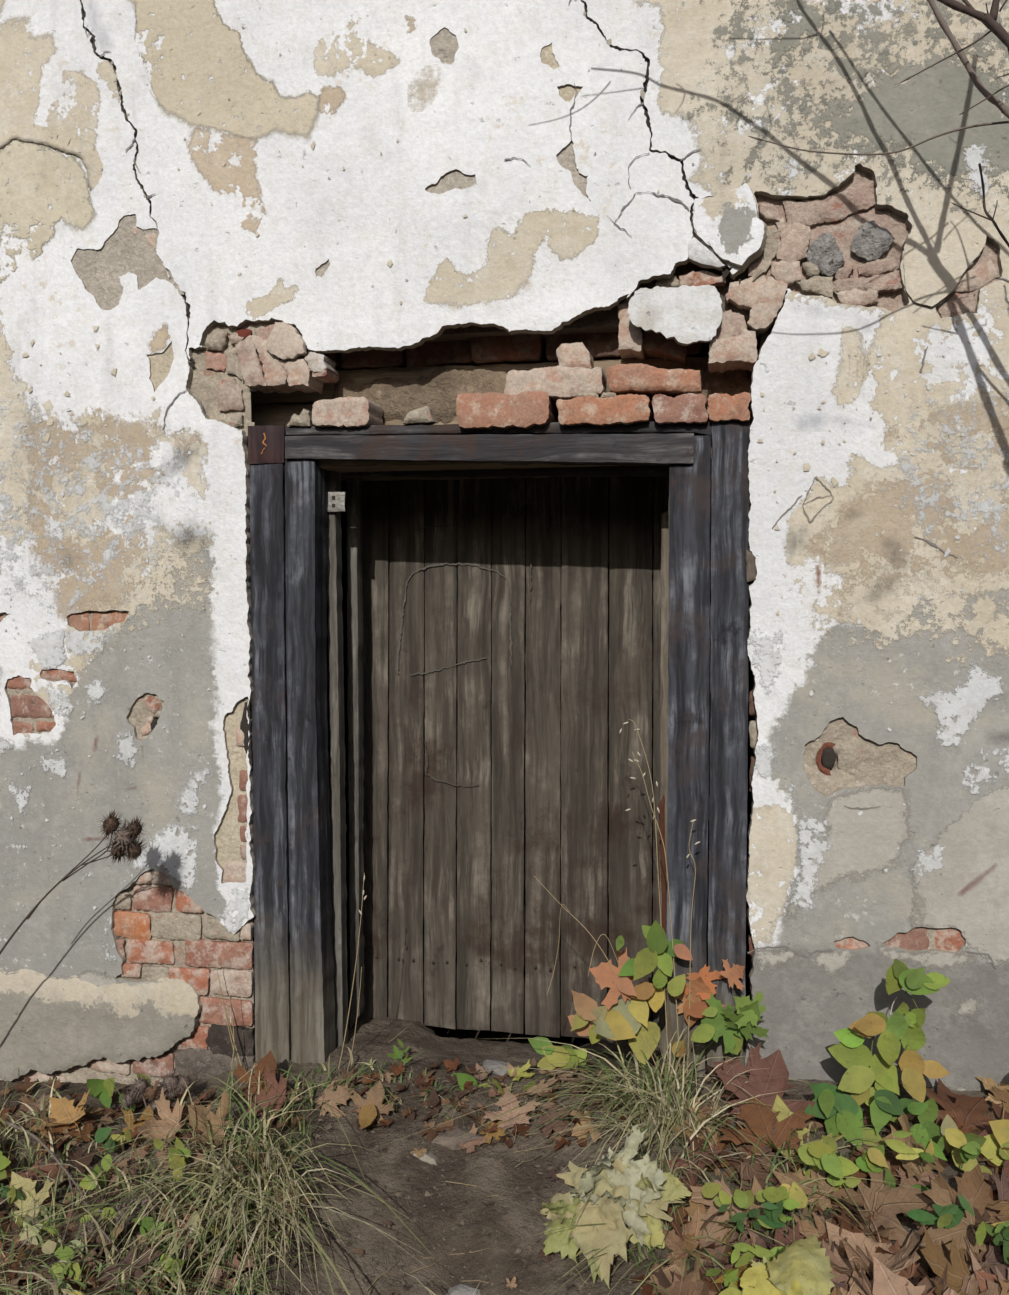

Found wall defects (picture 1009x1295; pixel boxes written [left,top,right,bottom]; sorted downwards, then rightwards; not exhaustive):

peeling [0,0,215,743]
crack [80,0,156,222]
crack [182,292,190,318]
peeling [129,0,400,237]
spalling [190,278,339,436]
peeling [423,142,600,308]
crack [568,0,732,279]
peeling [617,0,1009,630]
spalling [216,697,253,882]
spalling [803,717,916,807]
flaking render [0,869,256,1086]
spalling [835,927,965,952]